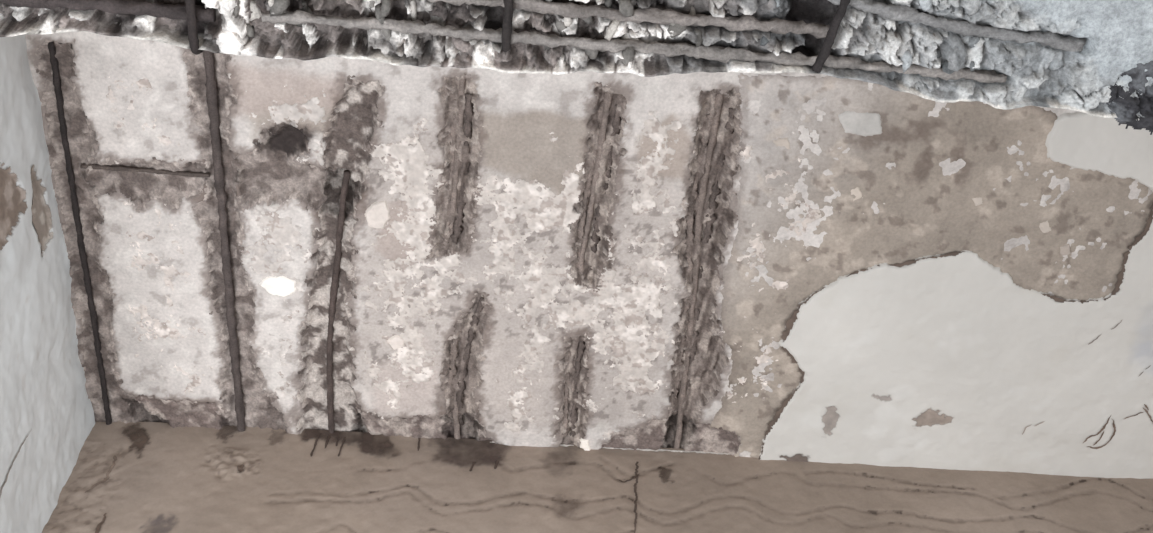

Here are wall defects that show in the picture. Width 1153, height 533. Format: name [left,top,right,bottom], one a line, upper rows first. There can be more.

spalling [0,0,190,49]
peeling [0,163,54,254]
spalling [35,39,237,430]
peeling [195,0,1153,458]
crack [617,462,639,533]